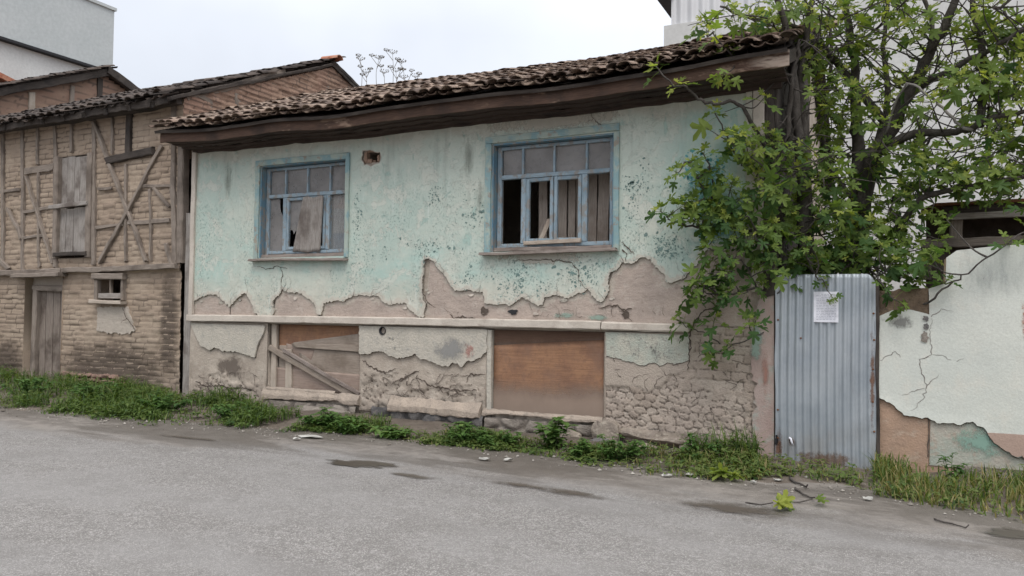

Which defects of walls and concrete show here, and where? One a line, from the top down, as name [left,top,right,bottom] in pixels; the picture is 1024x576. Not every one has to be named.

spalling [96,305,136,335]
spalling [189,217,762,448]
crack [880,309,961,411]
spalling [921,316,929,343]
spalling [879,398,1024,473]